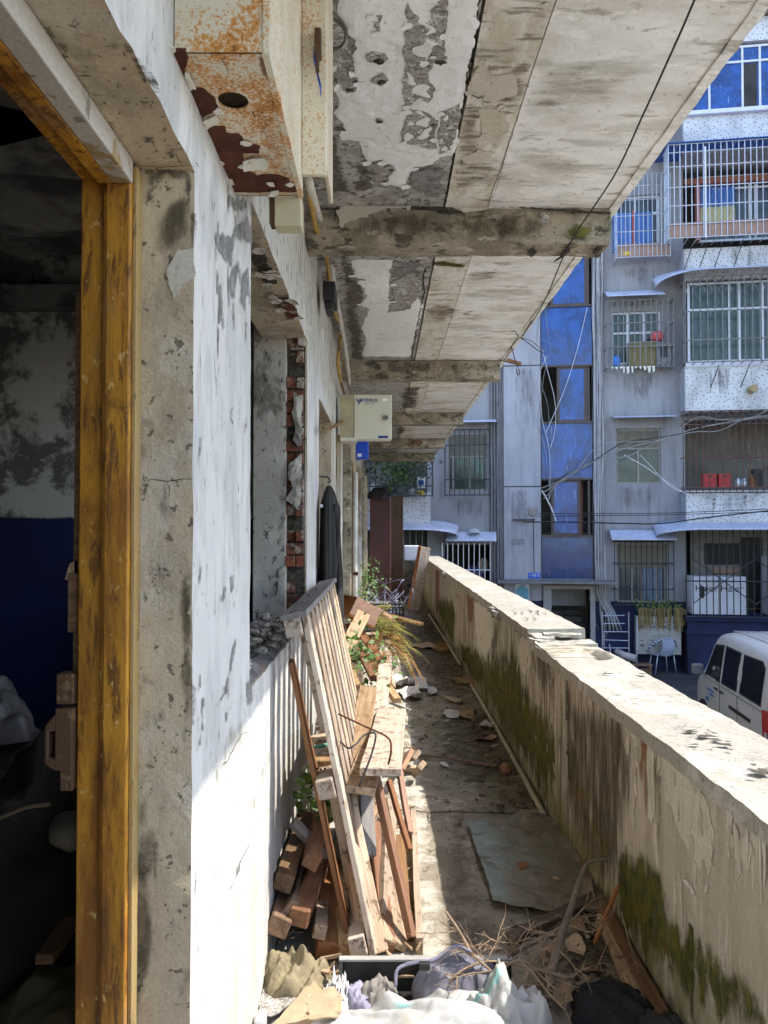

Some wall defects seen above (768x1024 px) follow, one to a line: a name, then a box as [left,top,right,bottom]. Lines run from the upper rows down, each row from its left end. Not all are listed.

rust [169,45,297,193]
peeling [333,0,518,190]
peeling [216,179,305,354]
peeling [348,259,424,357]
spalling [277,337,305,609]
damp [567,681,631,873]
damp [745,828,766,904]